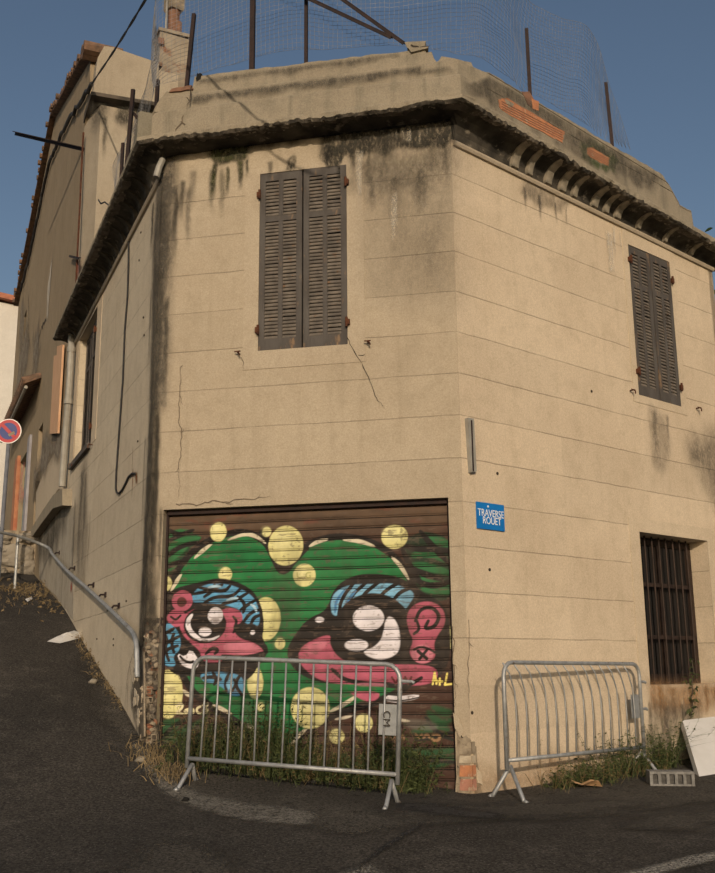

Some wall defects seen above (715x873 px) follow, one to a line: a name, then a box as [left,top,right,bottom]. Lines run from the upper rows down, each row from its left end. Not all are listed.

leakage [210,139,299,191]
leakage [322,119,454,174]
leakage [131,155,184,736]
crack [176,366,264,506]
spalling [132,617,163,744]
spalling [453,713,483,794]